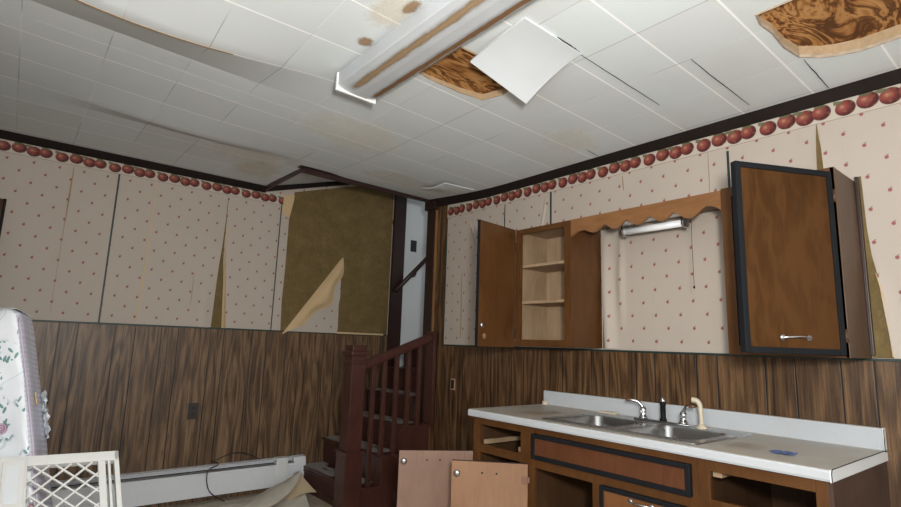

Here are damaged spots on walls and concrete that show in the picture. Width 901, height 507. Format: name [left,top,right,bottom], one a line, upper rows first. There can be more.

water stain [403,1,420,13]
spalling [758,15,901,55]